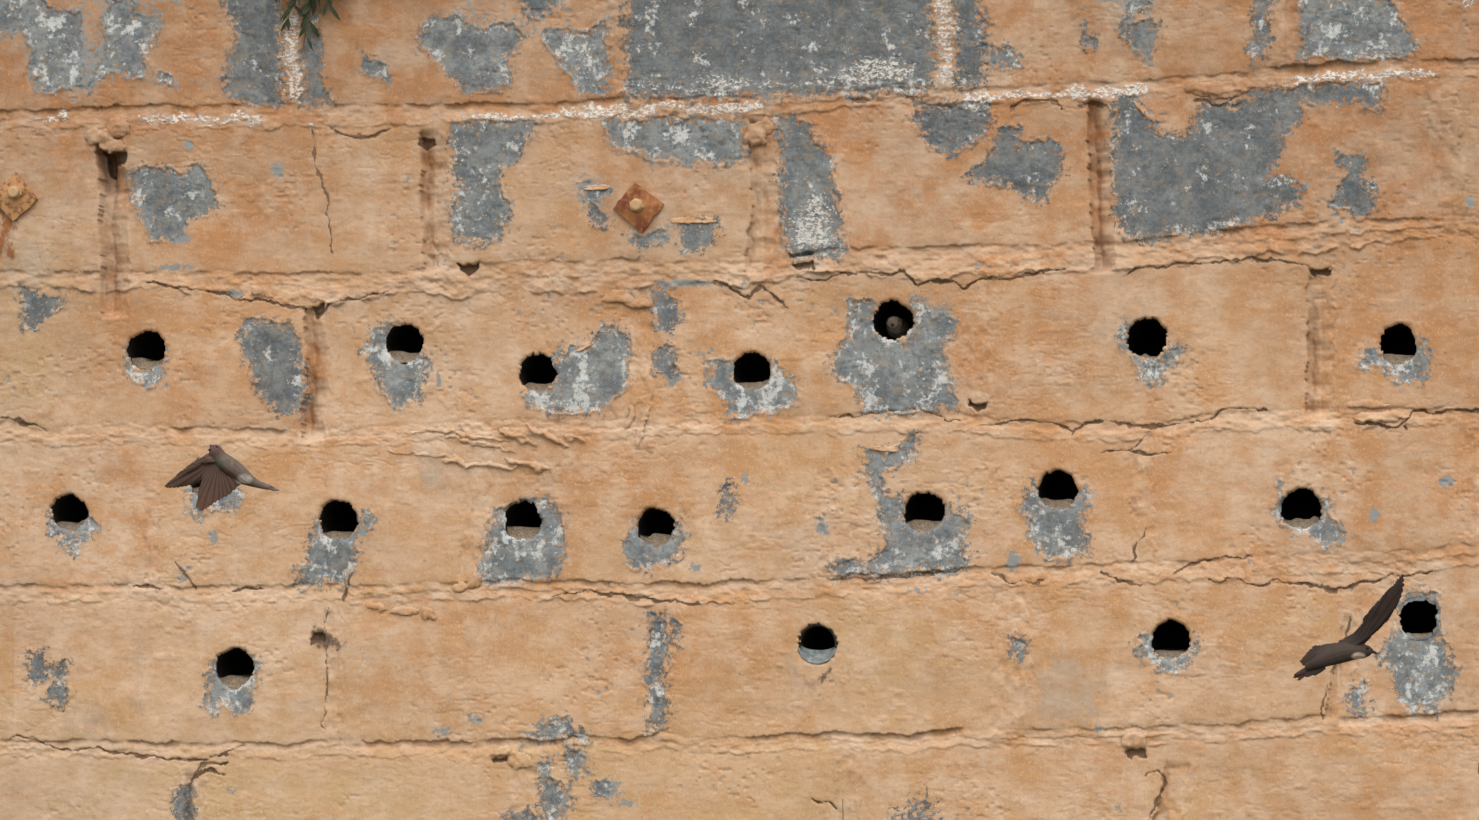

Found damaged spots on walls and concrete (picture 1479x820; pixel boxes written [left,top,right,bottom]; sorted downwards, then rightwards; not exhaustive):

peeling [0,0,186,97]
peeling [103,151,226,244]
peeling [217,0,339,115]
crack [311,128,389,254]
peeling [354,47,392,87]
peeling [413,0,1071,276]
peeling [1078,0,1168,68]
peeling [1104,0,1422,247]
peeling [234,303,325,422]
peeling [823,293,987,586]
peeling [638,606,685,741]